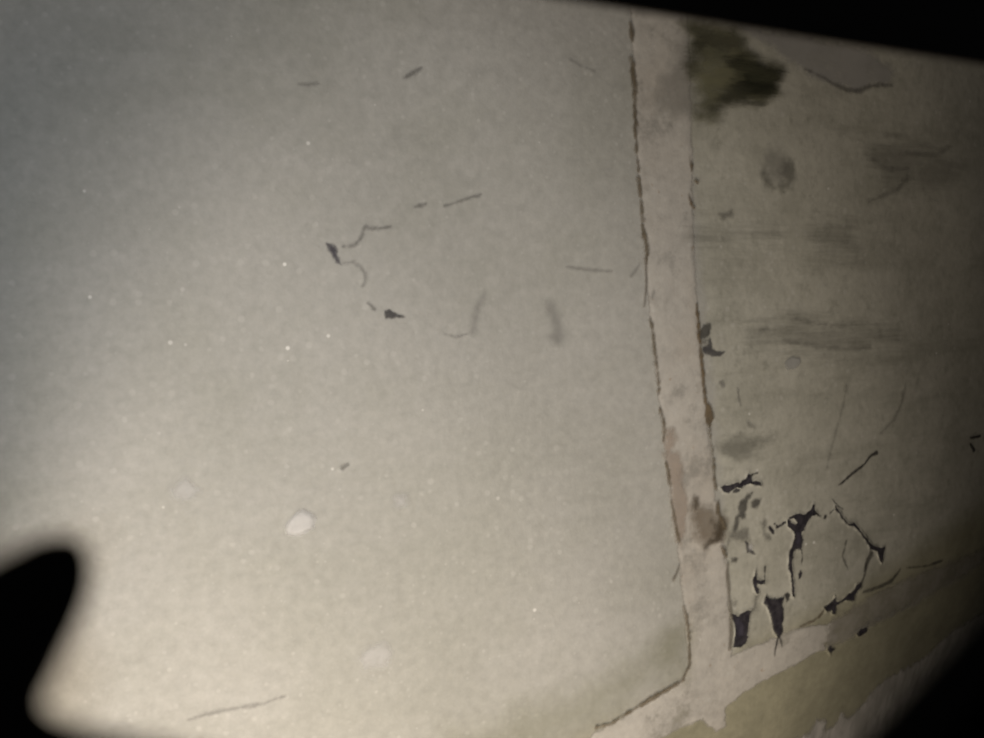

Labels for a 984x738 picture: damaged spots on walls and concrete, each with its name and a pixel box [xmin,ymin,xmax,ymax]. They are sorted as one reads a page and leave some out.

leakage [687,23,785,120]
rust [696,304,714,438]
peeling [717,469,764,496]
peeling [729,500,822,655]